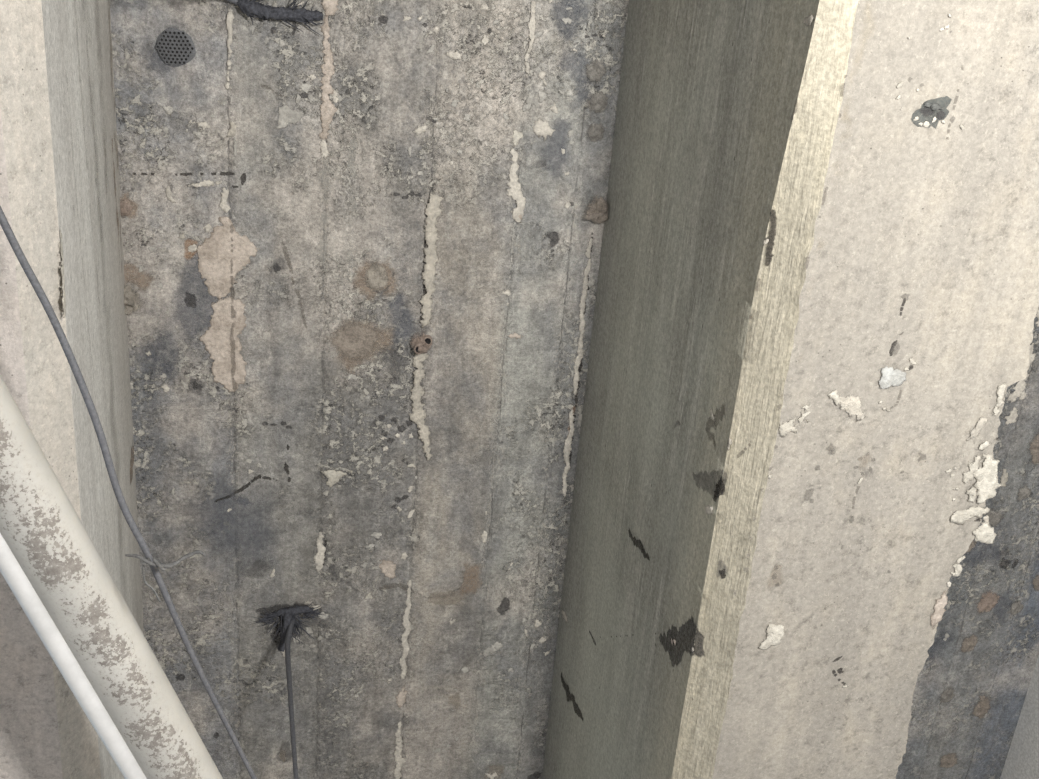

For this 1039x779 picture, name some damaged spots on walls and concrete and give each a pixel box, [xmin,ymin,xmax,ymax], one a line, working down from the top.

peeling [177,188,260,392]
spalling [825,389,867,422]
spalling [878,340,916,412]
damp [1005,342,1036,425]
spalling [946,384,1009,544]
spalling [759,623,785,650]
spalling [930,556,966,641]